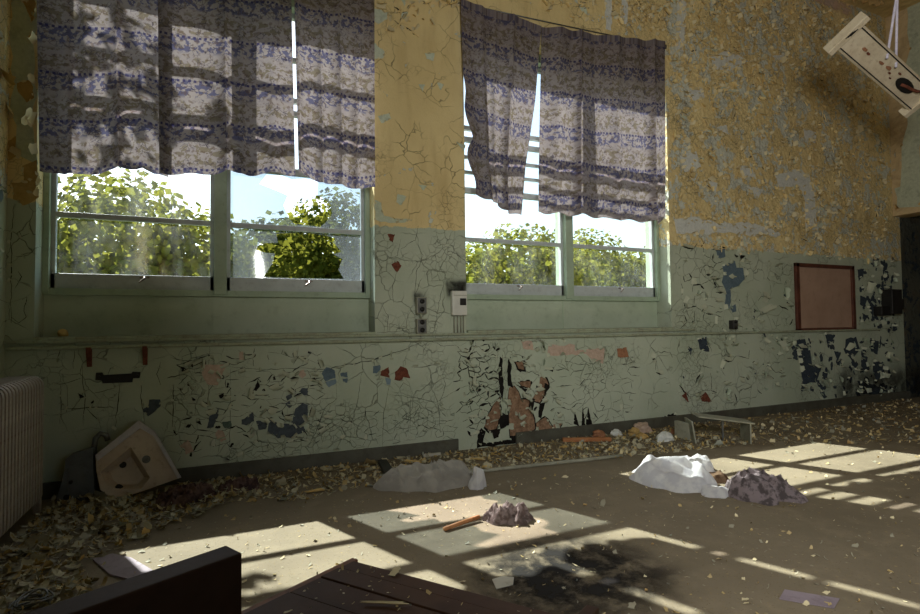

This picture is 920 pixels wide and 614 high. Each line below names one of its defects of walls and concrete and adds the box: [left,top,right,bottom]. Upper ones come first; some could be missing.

peeling [374,0,461,37]
peeling [542,0,651,31]
peeling [0,0,41,206]
peeling [674,87,920,403]
peeling [143,399,161,416]
peeling [173,350,348,446]
peeling [373,365,411,385]
crack [53,228,793,463]
spalling [464,335,629,448]